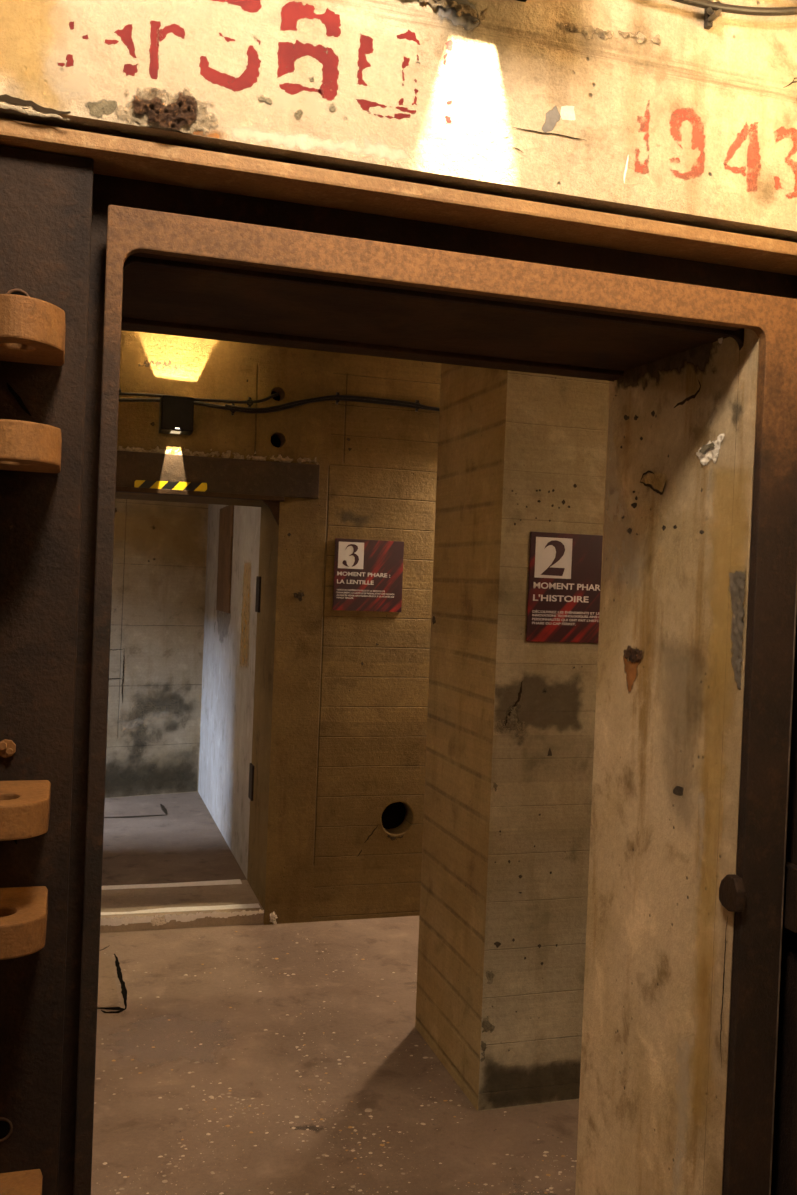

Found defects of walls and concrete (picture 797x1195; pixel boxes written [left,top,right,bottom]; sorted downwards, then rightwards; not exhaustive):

spalling [419,0,488,24]
spalling [116,87,221,139]
leakage [495,677,580,744]
leakage [105,685,197,796]
leakage [484,1061,581,1108]